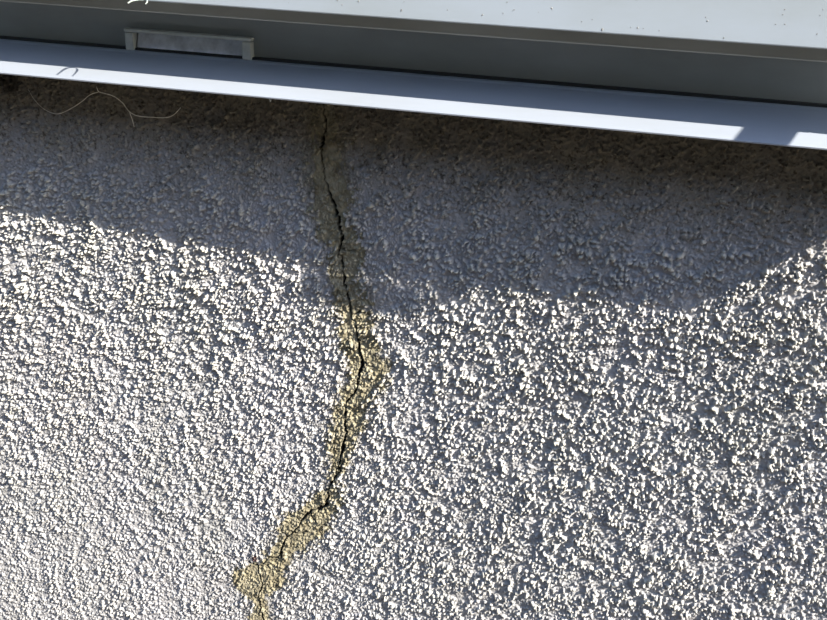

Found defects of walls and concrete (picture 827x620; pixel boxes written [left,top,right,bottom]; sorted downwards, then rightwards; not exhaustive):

crack [258,115,373,615]